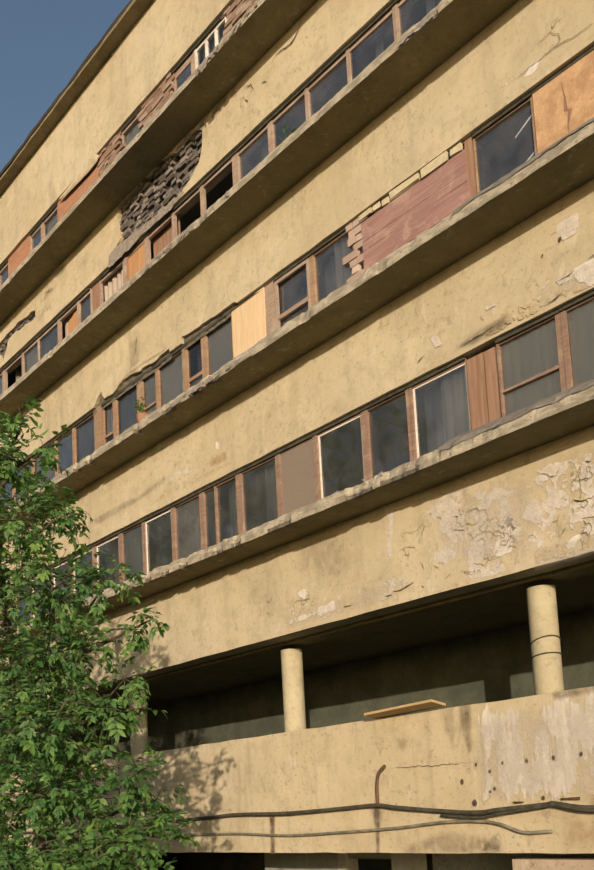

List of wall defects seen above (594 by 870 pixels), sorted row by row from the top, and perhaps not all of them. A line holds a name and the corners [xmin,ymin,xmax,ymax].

flaking render [108,118,205,267]
peeling [556,213,579,240]
flaking render [0,312,36,360]
peeling [485,258,594,336]
peeling [422,453,594,579]
peeling [276,589,341,633]
peeling [476,689,594,809]